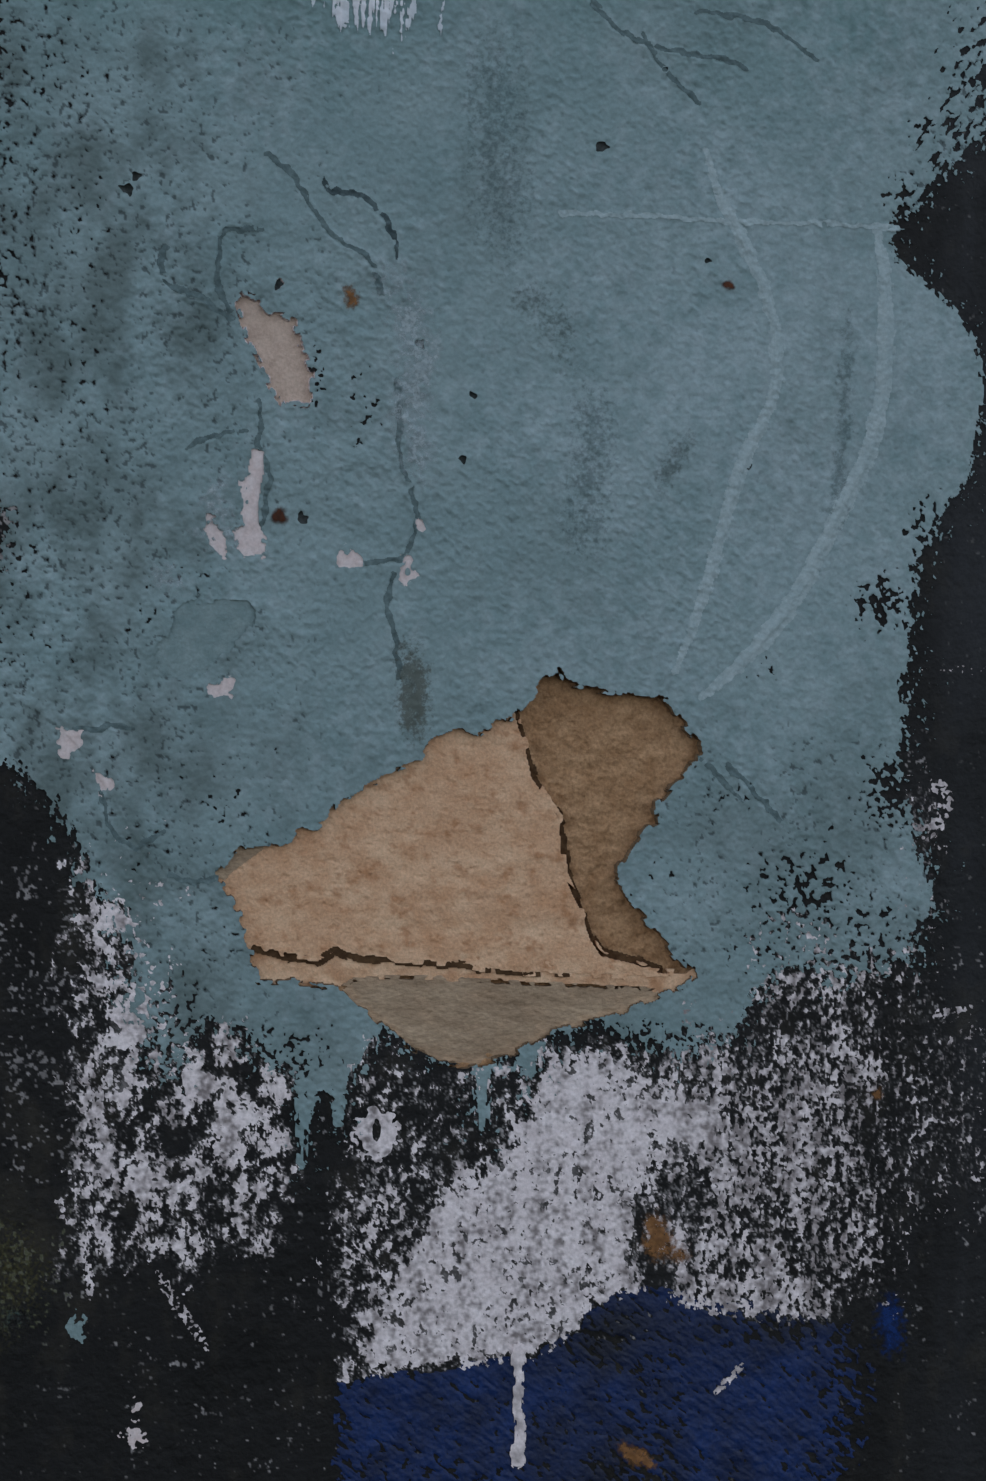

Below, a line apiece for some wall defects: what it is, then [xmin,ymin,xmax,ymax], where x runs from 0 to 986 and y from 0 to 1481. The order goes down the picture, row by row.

peeling [203,448,267,560]
peeling [235,291,315,408]
peeling [44,843,305,1310]
flaking render [215,667,986,1383]